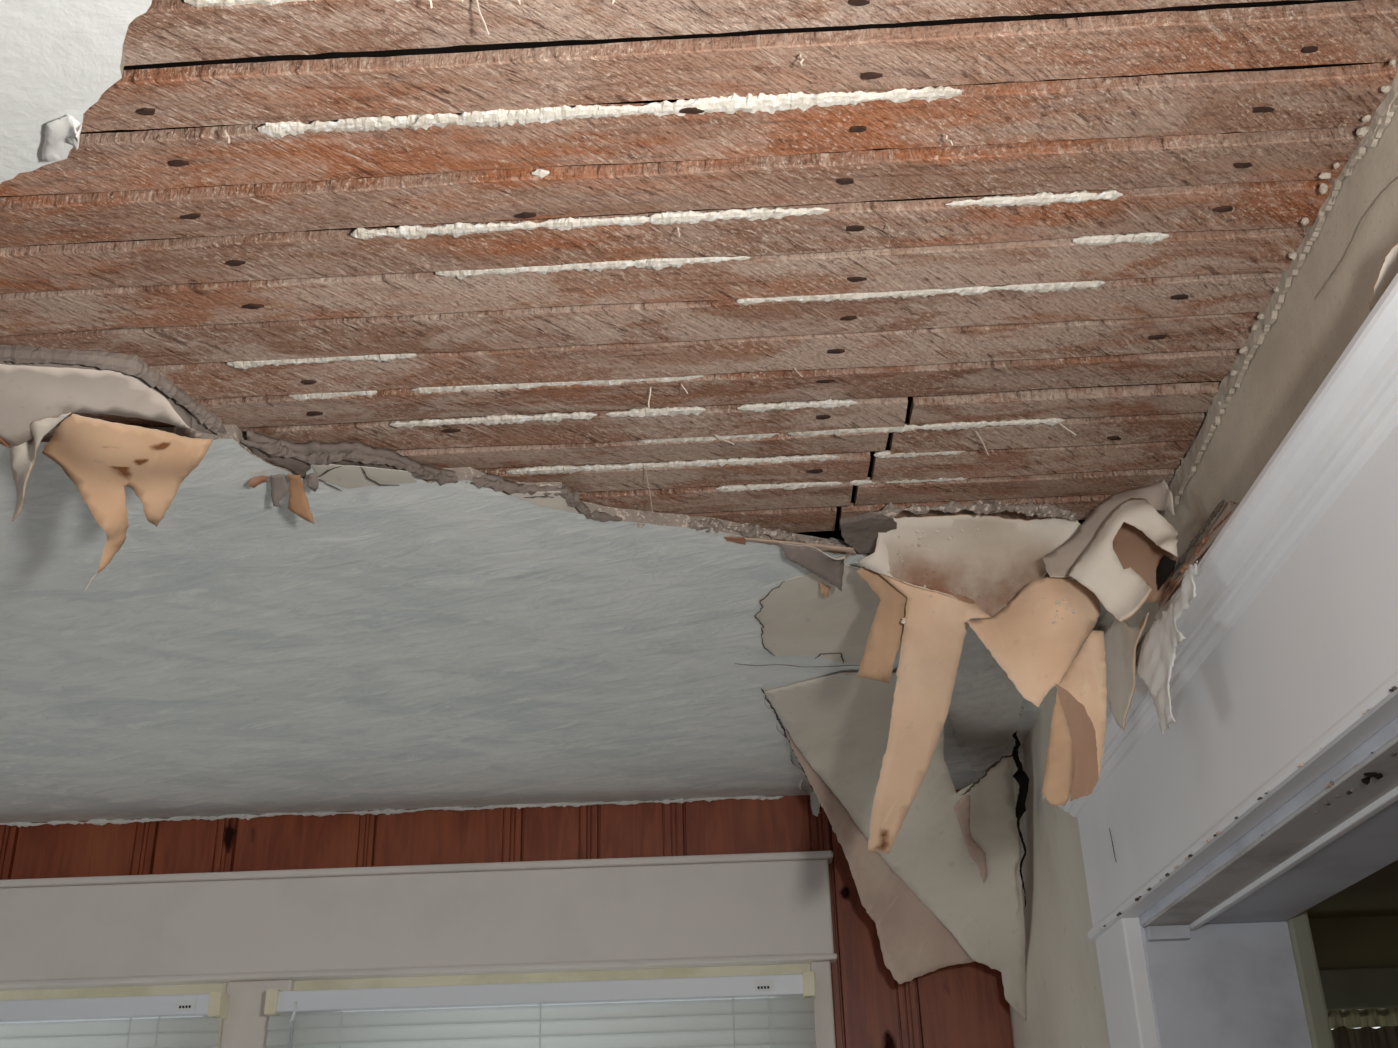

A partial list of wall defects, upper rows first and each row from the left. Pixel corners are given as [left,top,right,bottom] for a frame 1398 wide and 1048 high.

peeling [42,114,82,162]
spalling [1169,59,1398,508]
spalling [0,345,645,528]
spalling [665,500,1079,554]
peeling [763,695,821,817]
crack [962,731,1029,909]